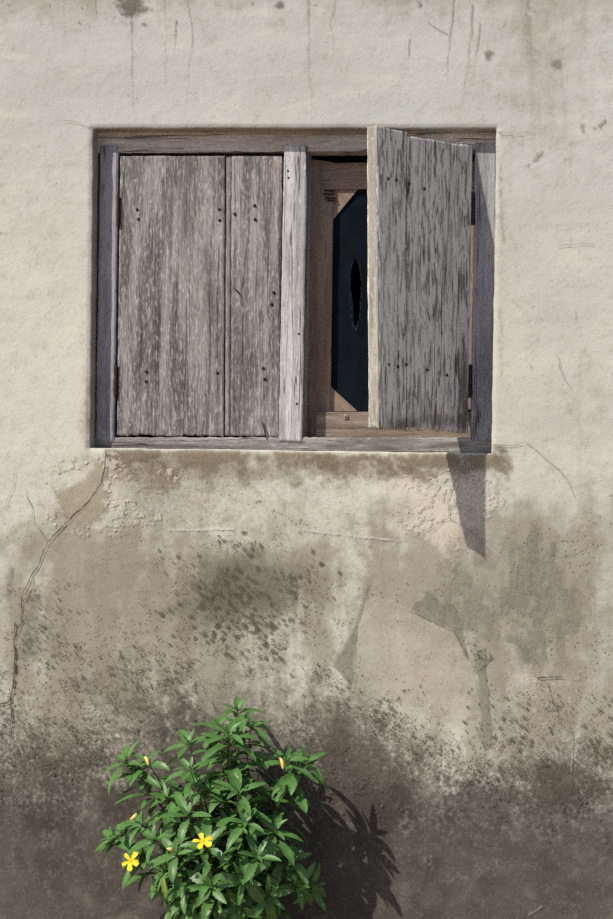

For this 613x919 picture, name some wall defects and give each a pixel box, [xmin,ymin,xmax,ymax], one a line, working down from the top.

crack [0,451,107,763]
leakage [0,531,325,820]
leakage [105,446,509,535]
leakage [284,584,459,817]
leakage [461,639,613,842]